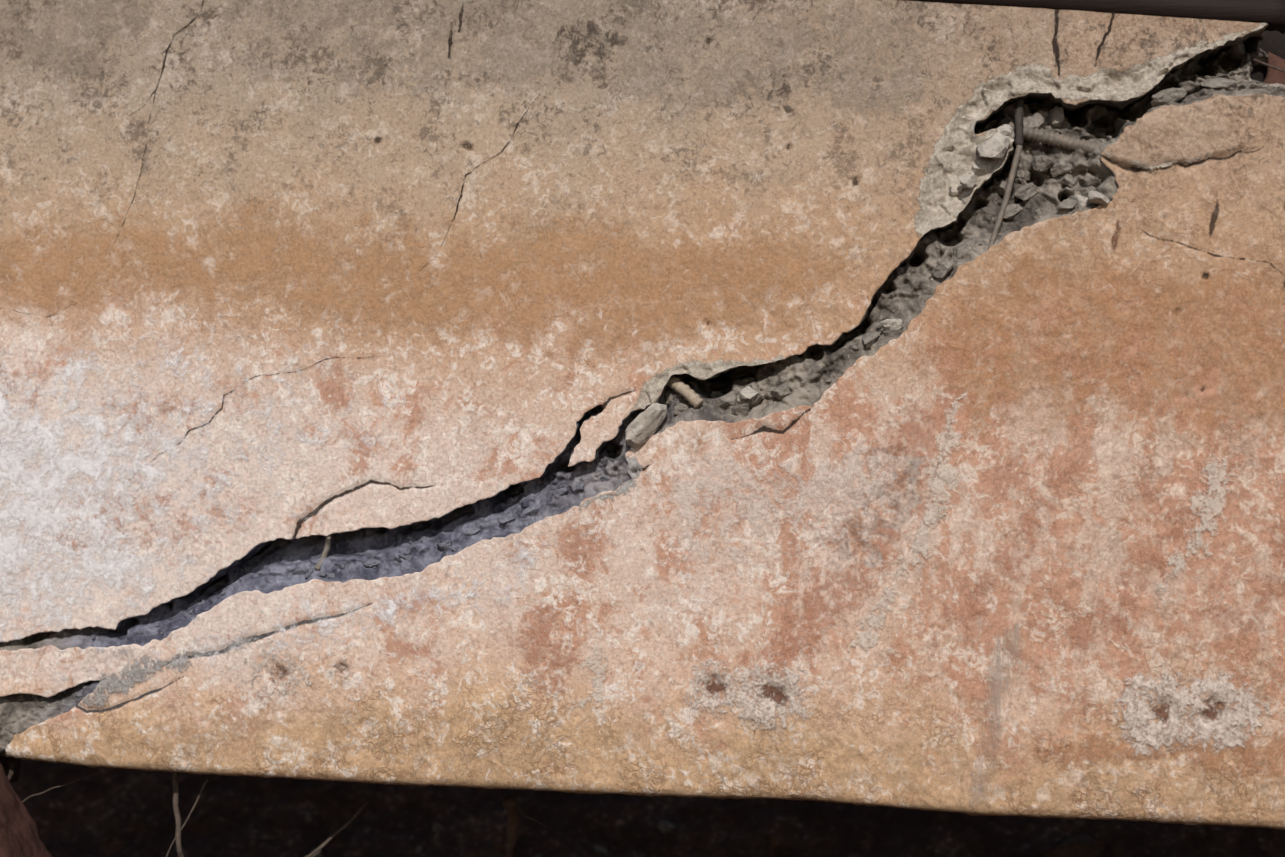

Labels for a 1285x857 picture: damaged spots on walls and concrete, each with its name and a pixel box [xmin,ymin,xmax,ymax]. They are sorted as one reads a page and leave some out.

crack [1052,9,1060,75]
spalling [914,23,1267,250]
crack [1095,12,1115,67]
crack [0,36,1285,713]
water stain [0,355,230,641]
water stain [1112,667,1272,756]